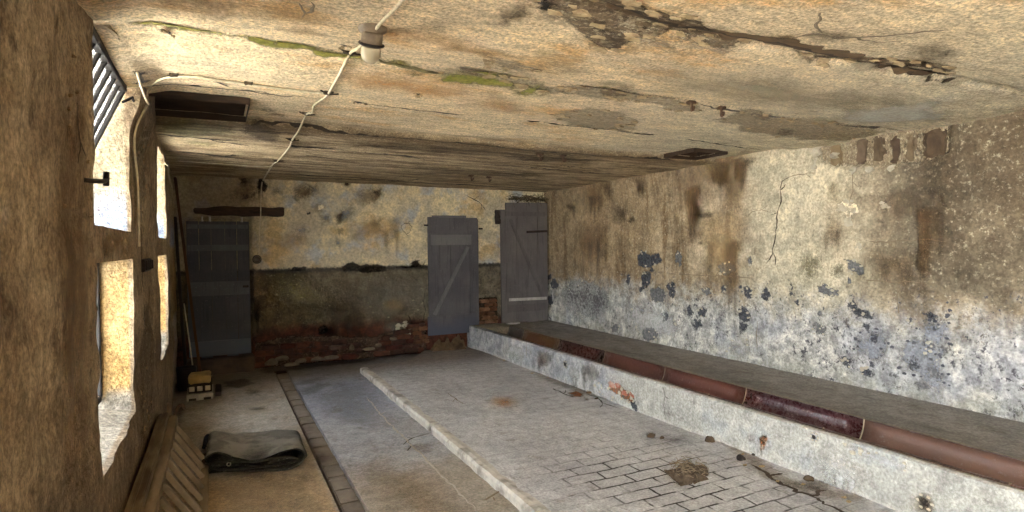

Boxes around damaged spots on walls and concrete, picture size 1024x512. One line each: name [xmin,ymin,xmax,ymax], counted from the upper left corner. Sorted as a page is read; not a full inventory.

spalling [527,0,732,54]
spalling [869,57,959,83]
flaking render [810,126,950,175]
crack [671,173,810,285]
flaking render [253,321,429,368]
peeling [626,250,682,342]
peeling [687,261,771,340]
peeling [812,311,825,336]
peeling [817,259,894,377]
peeling [897,301,953,391]
flaking render [587,381,638,412]